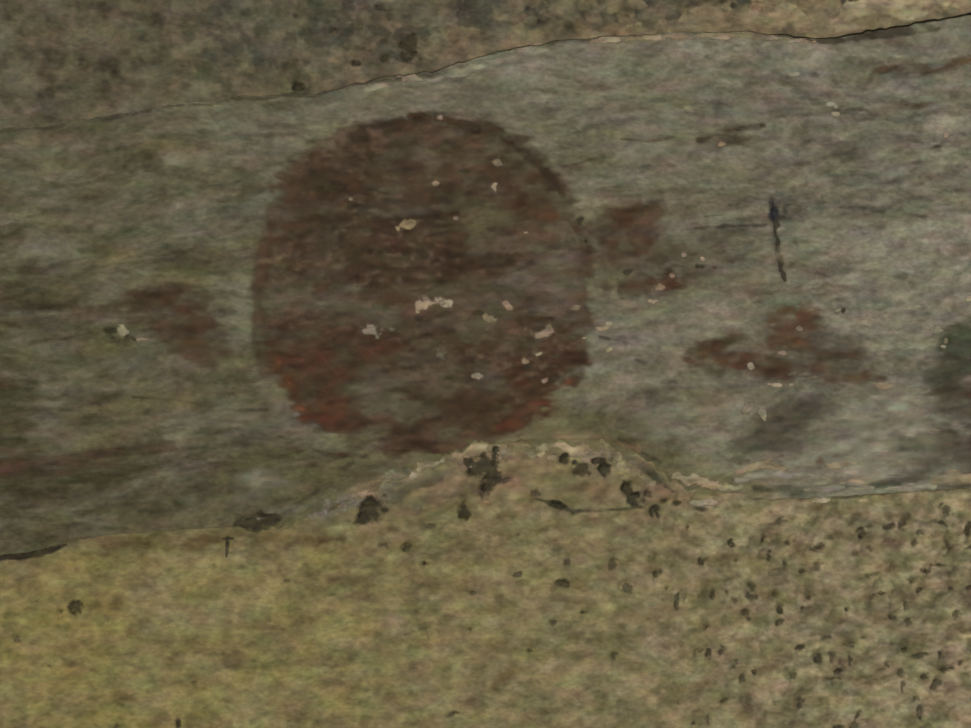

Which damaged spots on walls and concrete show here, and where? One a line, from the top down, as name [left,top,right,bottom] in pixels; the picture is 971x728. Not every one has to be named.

crack [588,26,940,44]
crack [351,46,551,91]
crack [231,92,327,100]
crack [700,202,796,282]
rust [252,112,666,454]
rust [645,271,683,304]
rust [702,340,855,387]
spalling [321,430,818,524]
peeling [856,469,971,490]
spalling [233,510,281,531]
crack [0,544,67,560]